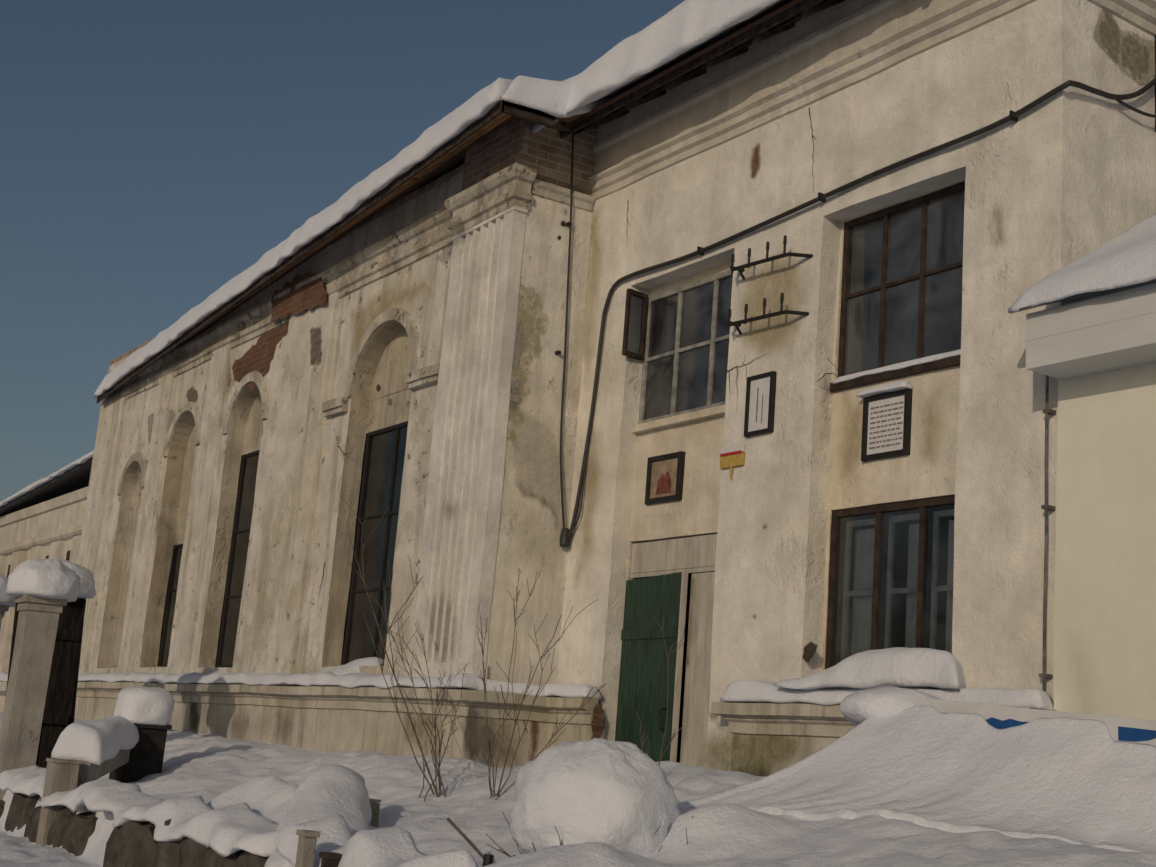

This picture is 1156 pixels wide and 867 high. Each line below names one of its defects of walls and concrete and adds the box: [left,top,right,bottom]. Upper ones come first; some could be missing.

peeling [1094,8,1155,85]
crack [809,108,817,192]
flaking render [232,273,327,392]
flaking render [591,704,605,740]